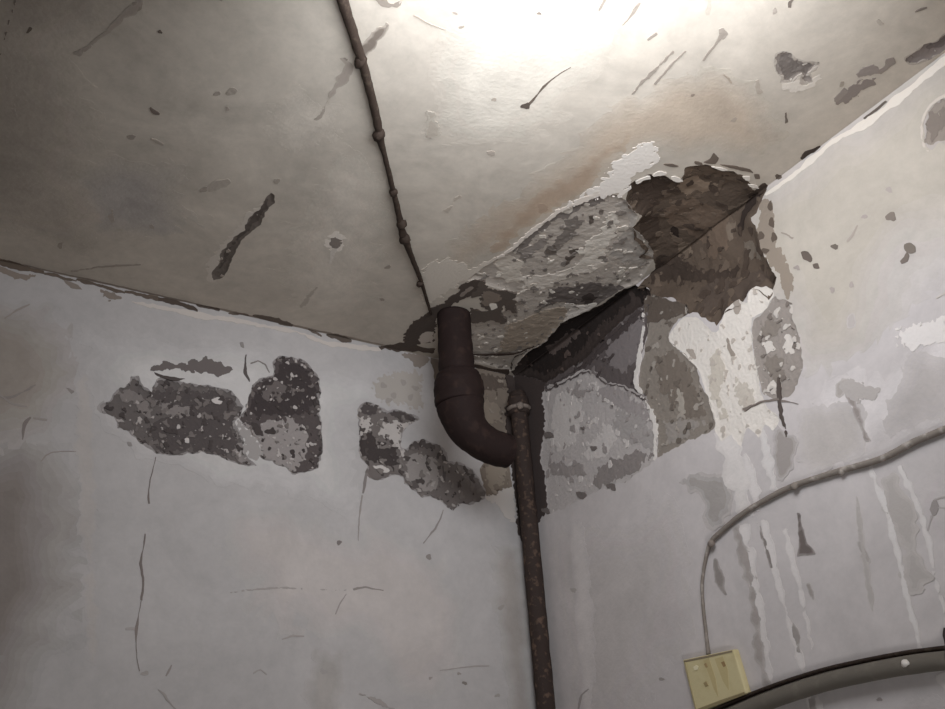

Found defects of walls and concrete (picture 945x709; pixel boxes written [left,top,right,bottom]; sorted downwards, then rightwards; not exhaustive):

spalling [774,51,820,85]
spalling [834,33,945,105]
damp [440,65,790,269]
crack [22,264,257,318]
spalling [100,356,323,475]
peeling [212,193,275,280]
crack [293,324,385,346]
spalling [357,402,512,511]
flaking render [420,141,803,514]
damp [633,313,659,461]
damp [679,351,945,691]
damp [549,489,696,709]